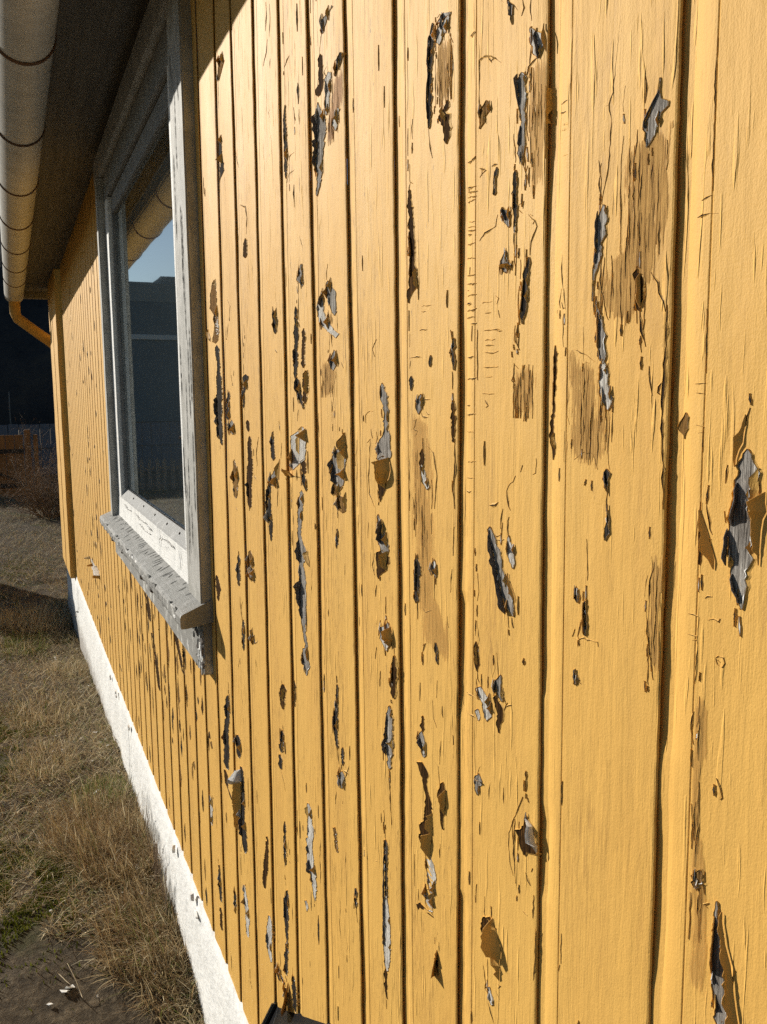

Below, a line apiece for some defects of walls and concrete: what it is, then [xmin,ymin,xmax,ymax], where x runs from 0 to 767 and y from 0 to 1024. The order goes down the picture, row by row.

peeling [283,0,354,207]
peeling [426,11,454,156]
peeling [499,0,547,350]
peeling [642,75,671,165]
peeling [591,162,615,495]
peeling [206,264,340,709]
peeling [322,427,347,549]
peeling [363,383,392,581]
peeling [467,509,520,733]
peeling [697,393,766,637]
peeling [414,715,448,978]
peeling [709,901,738,1024]